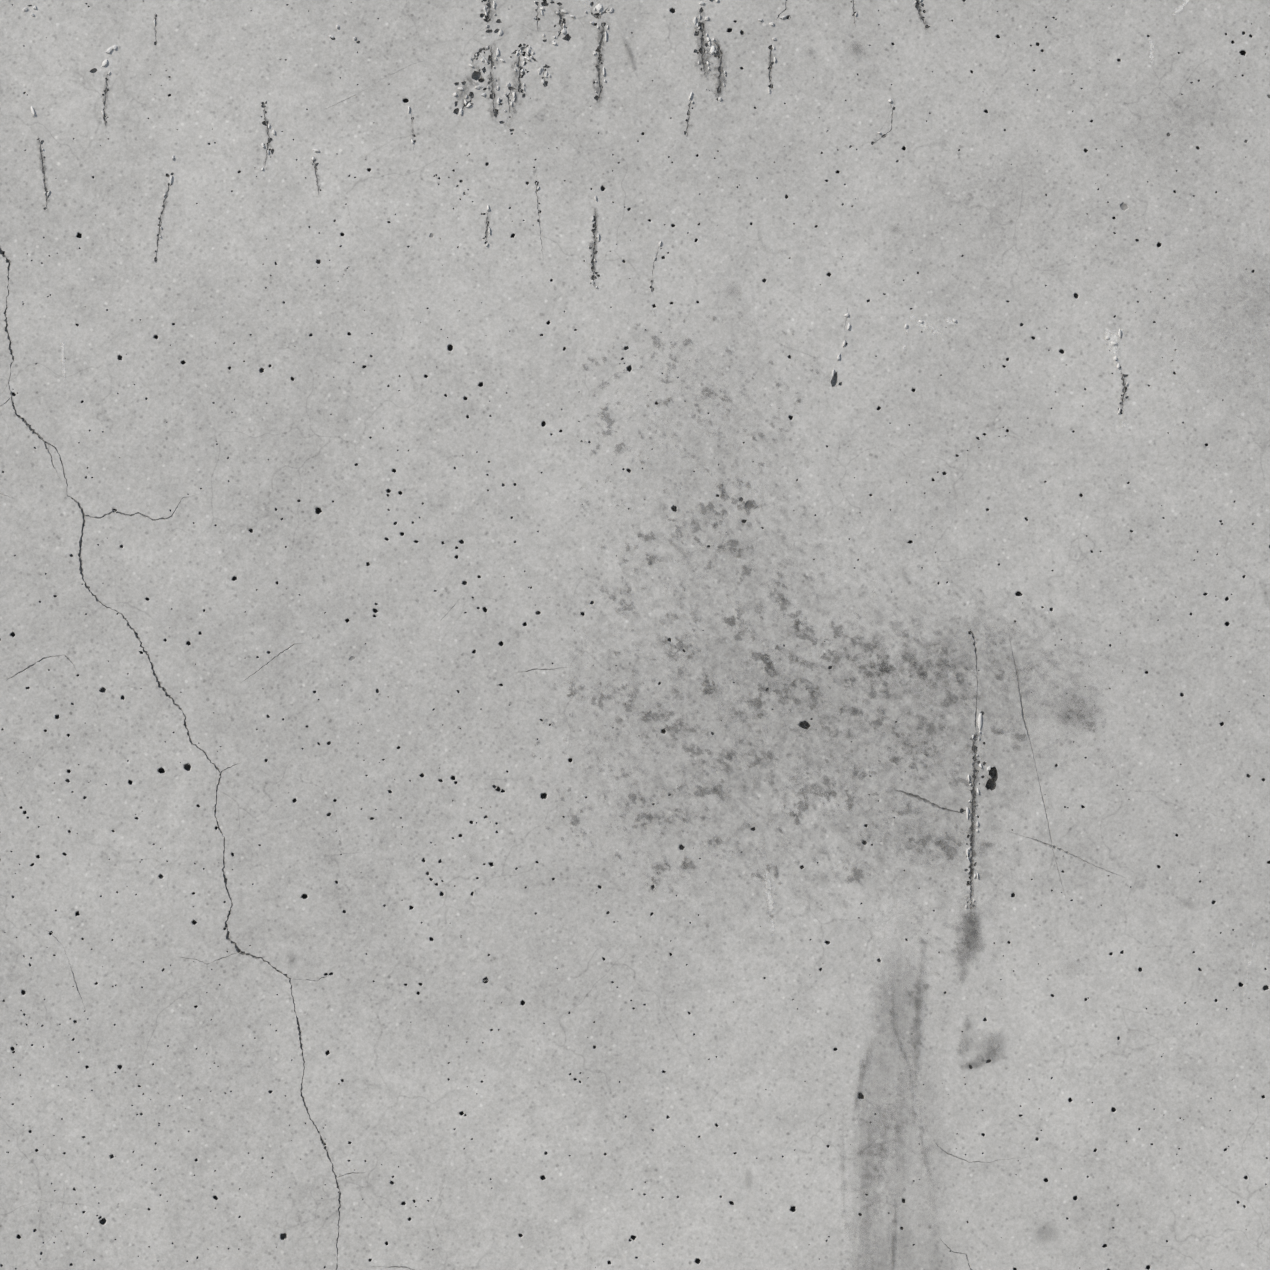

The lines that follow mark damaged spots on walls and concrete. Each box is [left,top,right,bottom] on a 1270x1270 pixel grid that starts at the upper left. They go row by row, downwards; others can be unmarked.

spalling [453,0,613,132]
spalling [693,0,727,101]
crack [0,246,365,1270]